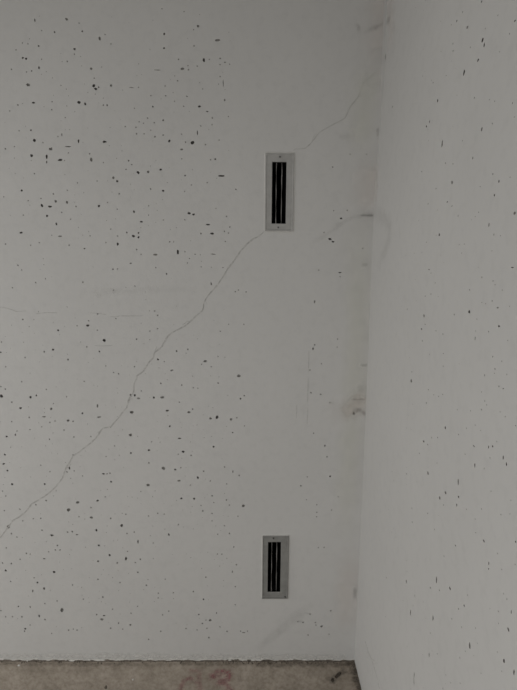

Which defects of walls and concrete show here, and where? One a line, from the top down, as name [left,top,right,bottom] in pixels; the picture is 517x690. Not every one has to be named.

crack [0,233,263,538]